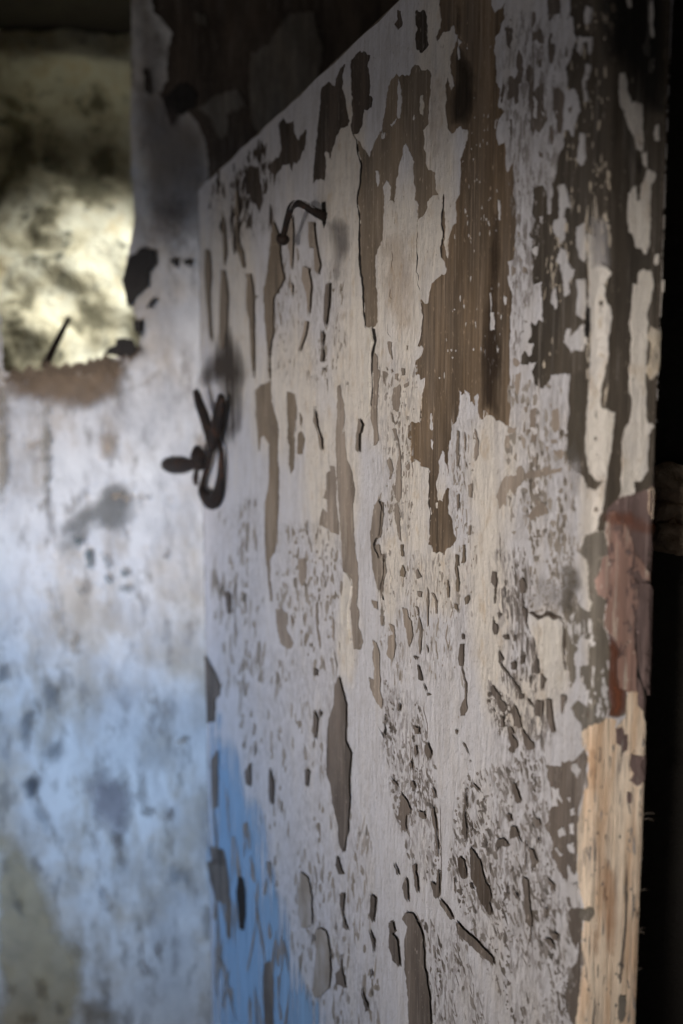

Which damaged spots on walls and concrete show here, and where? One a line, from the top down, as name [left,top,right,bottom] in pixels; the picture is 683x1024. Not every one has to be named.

peeling [143,0,671,1024]